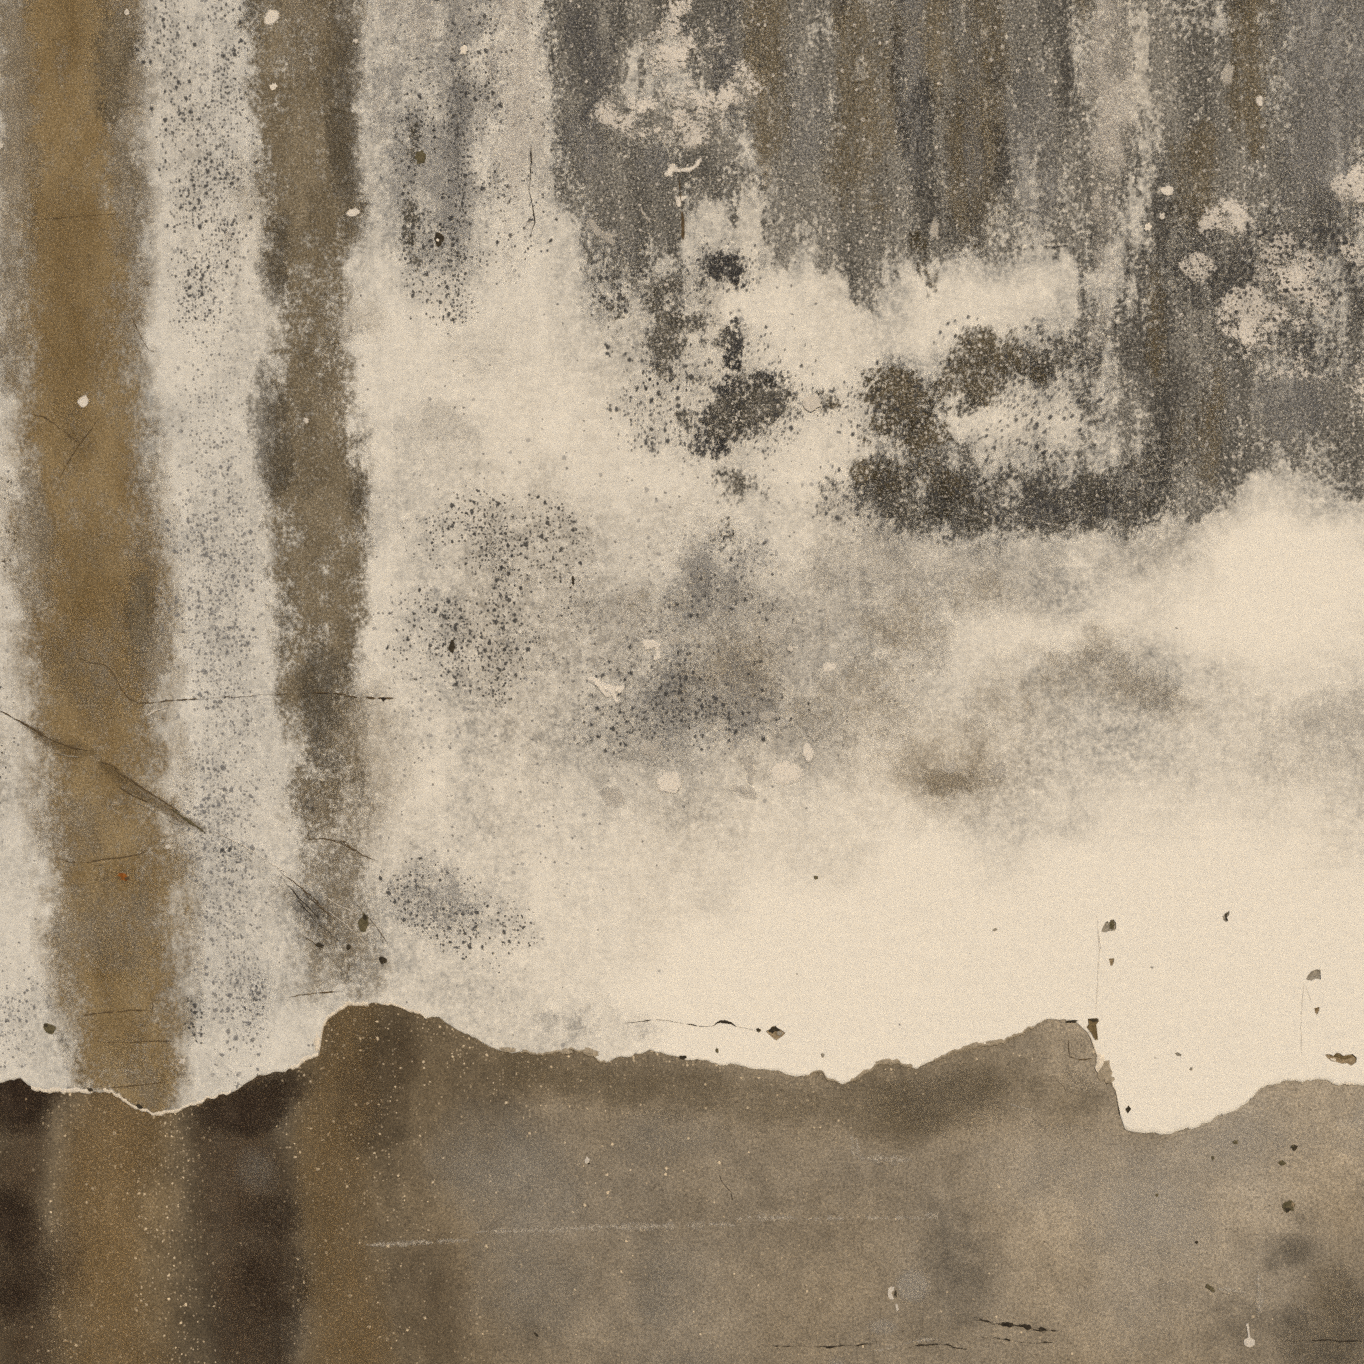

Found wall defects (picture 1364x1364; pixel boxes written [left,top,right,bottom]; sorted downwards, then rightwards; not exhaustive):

water stain [386,0,1364,762]
crack [58,849,149,866]
water stain [0,0,385,1364]
crack [304,838,376,861]
peeling [0,1001,1364,1364]